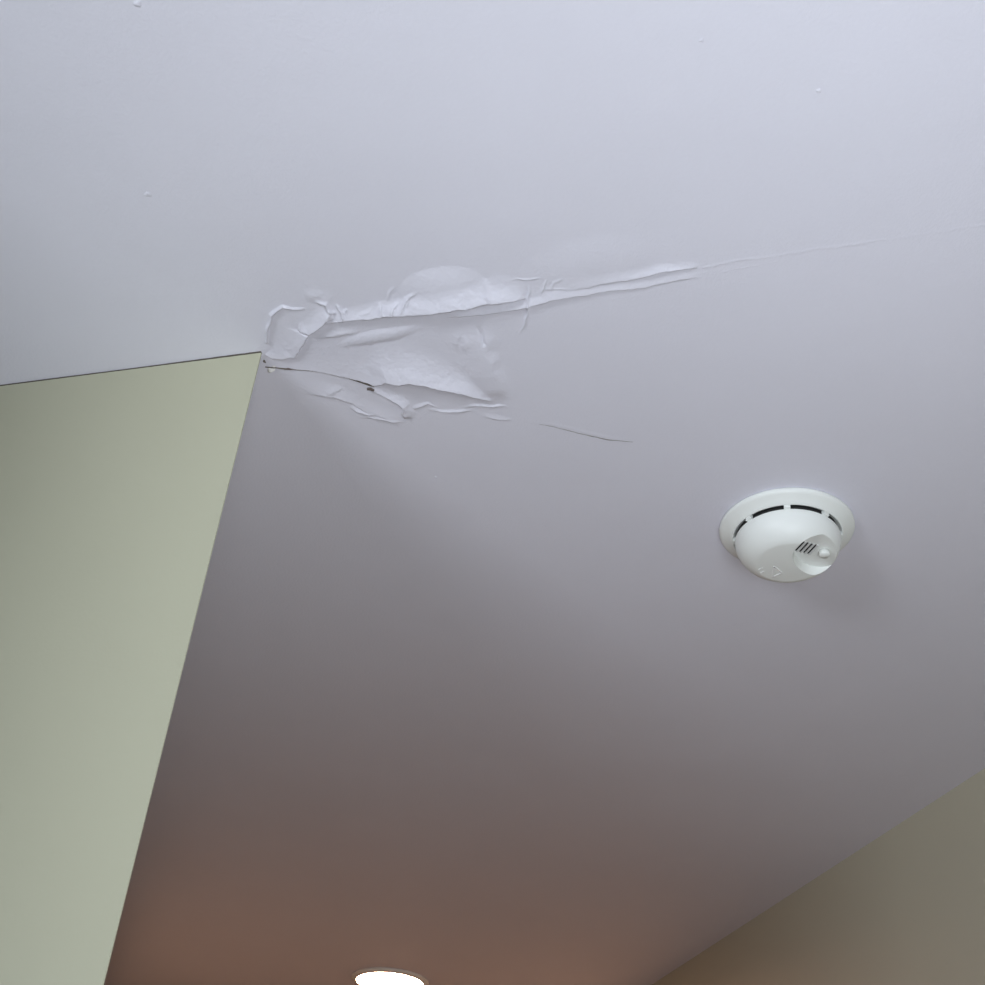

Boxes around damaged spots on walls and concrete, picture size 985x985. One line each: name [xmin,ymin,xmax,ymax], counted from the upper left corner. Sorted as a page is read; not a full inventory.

peeling [263,248,706,424]
crack [514,417,631,442]